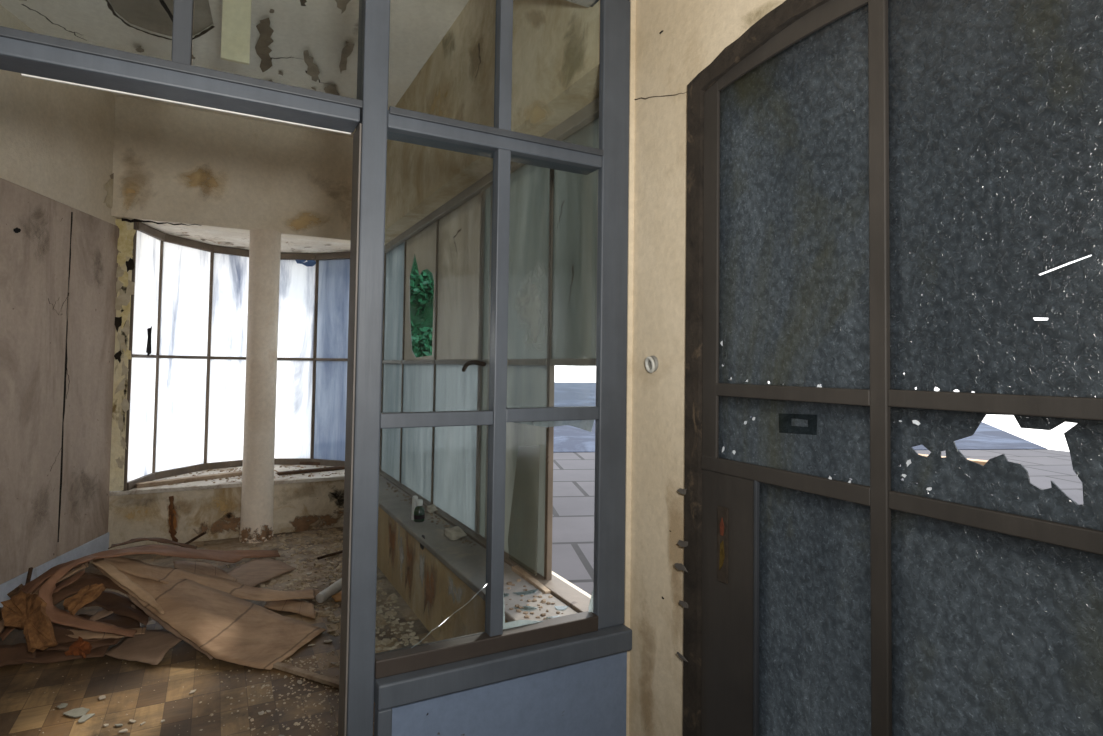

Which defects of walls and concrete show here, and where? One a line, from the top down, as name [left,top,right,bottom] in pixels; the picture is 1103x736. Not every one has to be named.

peeling [105,0,174,40]
peeling [192,0,215,40]
peeling [255,9,340,95]
peeling [339,41,355,72]
flaking render [196,509,344,543]